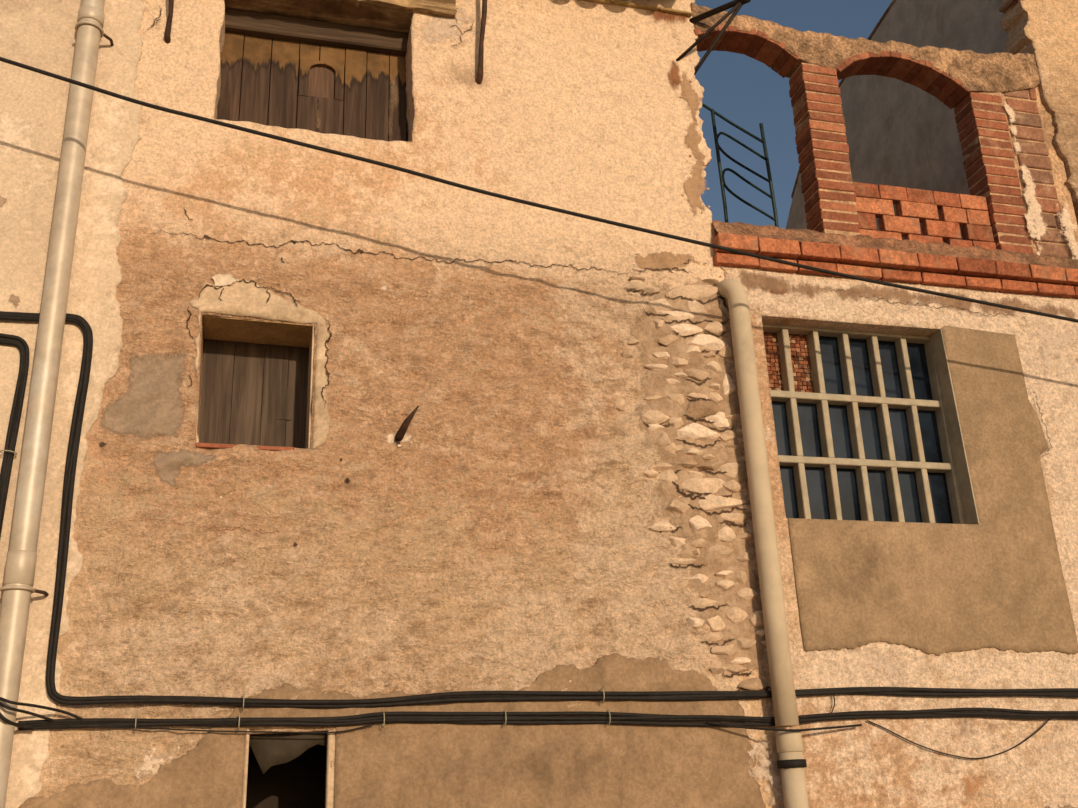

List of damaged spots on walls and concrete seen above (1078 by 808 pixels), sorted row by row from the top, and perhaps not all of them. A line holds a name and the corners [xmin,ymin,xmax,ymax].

crack [134,209,729,340]
flaking render [680,73,710,214]
damp [1004,101,1048,256]
damp [1056,203,1078,260]
crack [321,320,332,408]
flaking render [631,252,766,676]